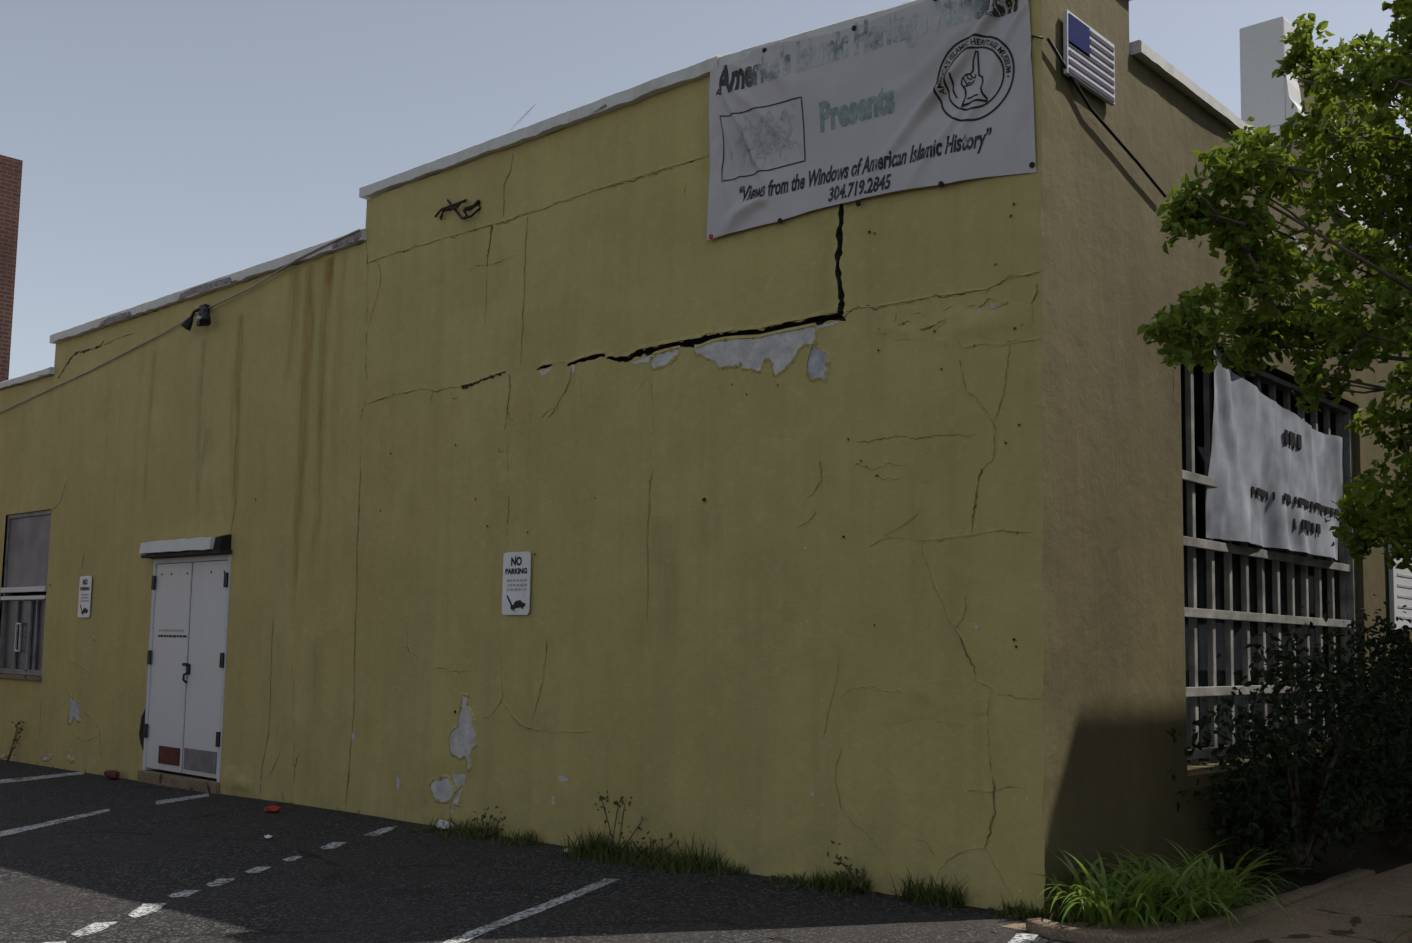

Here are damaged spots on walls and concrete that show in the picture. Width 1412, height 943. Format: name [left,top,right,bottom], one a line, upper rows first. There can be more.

peeling [632,321,839,396]
crack [345,154,1044,907]
peeling [429,693,478,822]